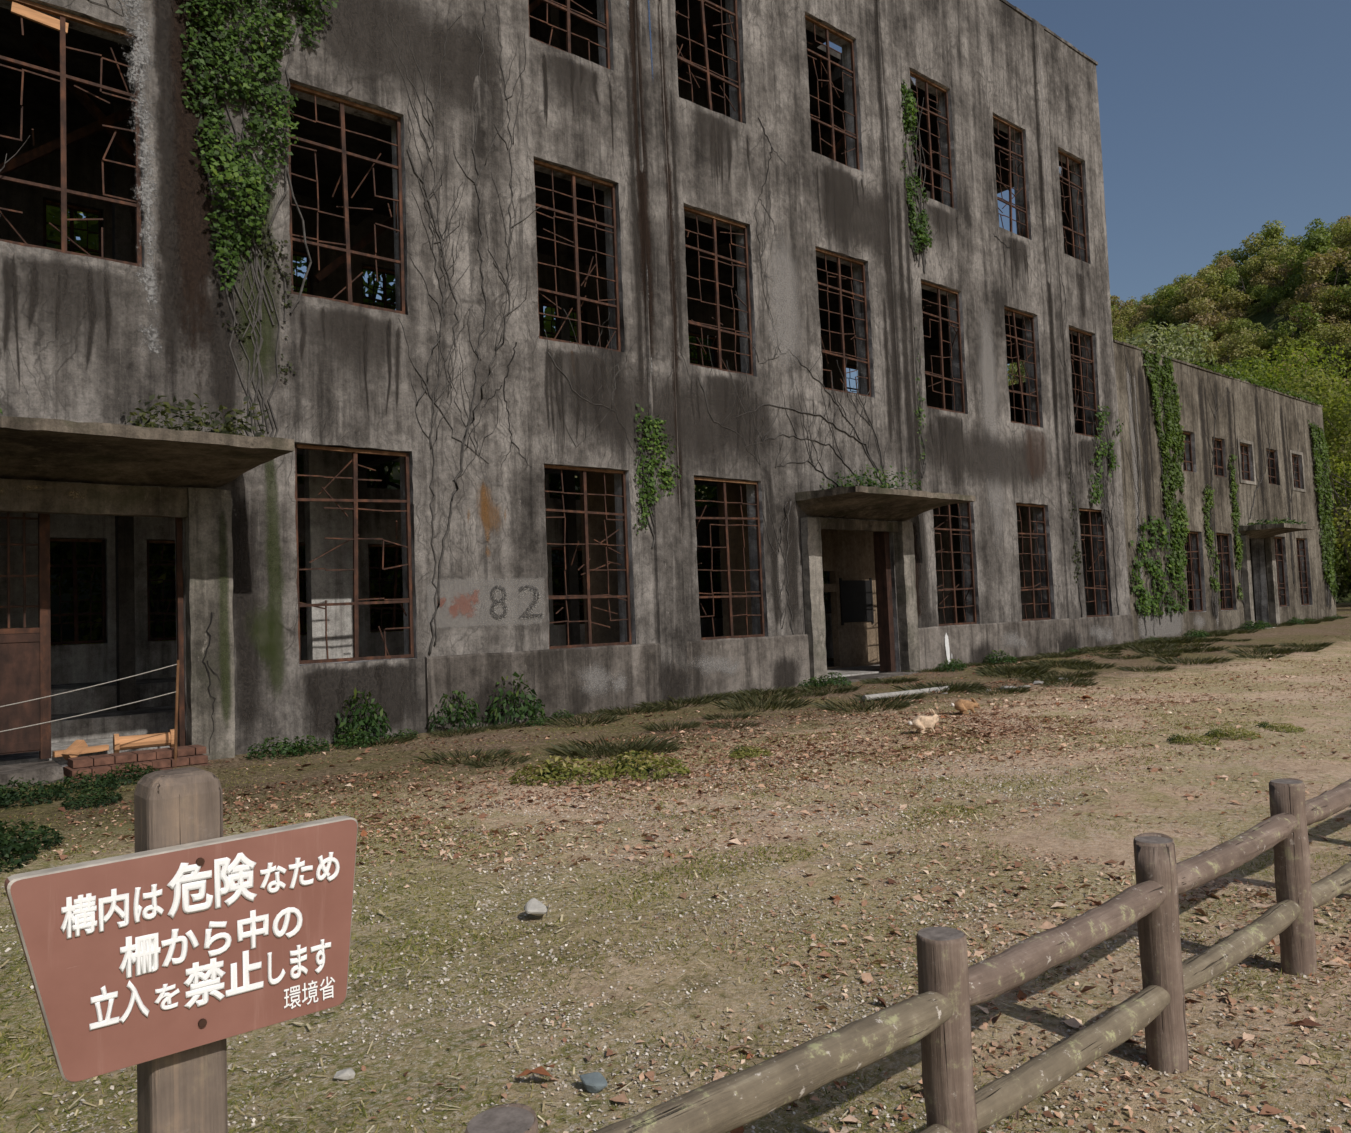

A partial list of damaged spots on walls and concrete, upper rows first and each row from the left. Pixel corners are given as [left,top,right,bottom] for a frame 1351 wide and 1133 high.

damp [3,260,111,382]
damp [118,0,235,418]
damp [300,309,400,413]
damp [543,0,769,537]